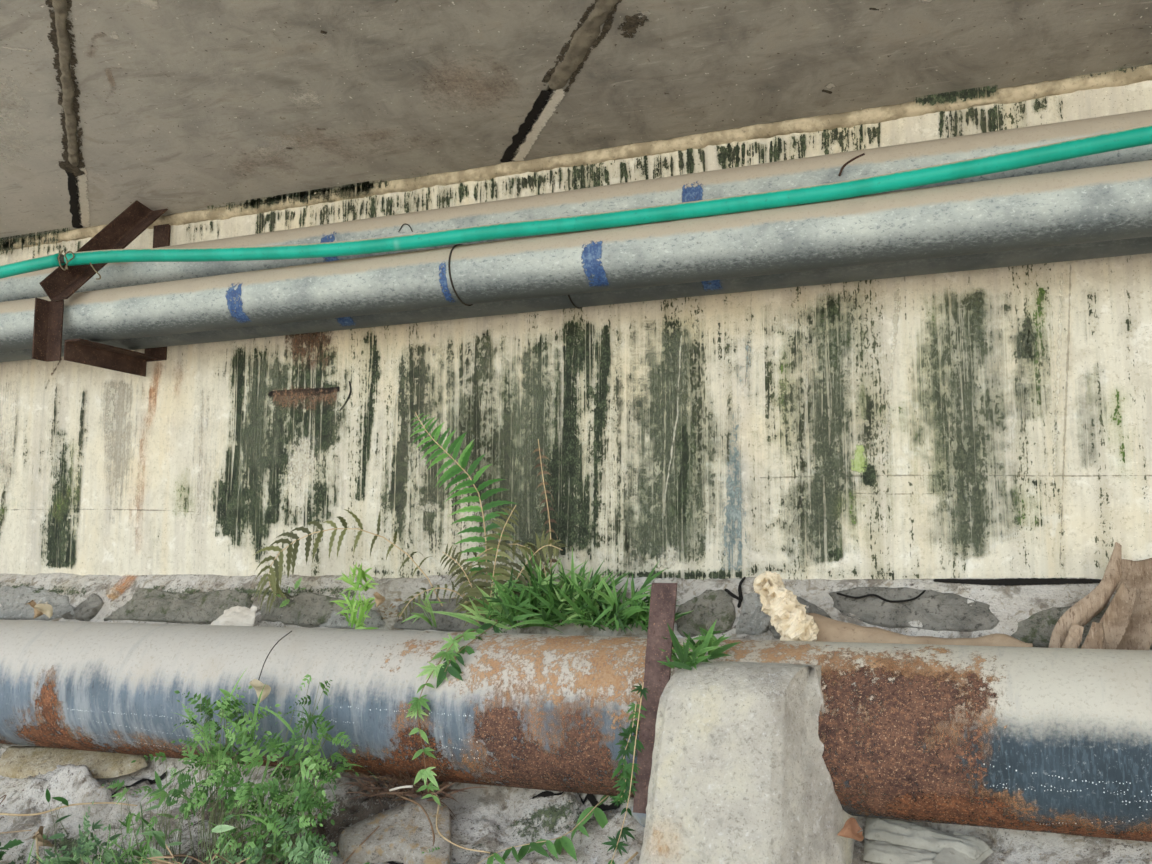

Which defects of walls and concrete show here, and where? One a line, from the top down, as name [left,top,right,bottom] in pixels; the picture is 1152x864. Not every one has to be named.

leakage [1021,97,1063,119]
leakage [186,123,880,240]
rust [285,331,331,369]
leakage [0,386,88,569]
leakage [210,290,903,581]
leakage [913,274,1066,557]
leakage [1082,389,1133,463]